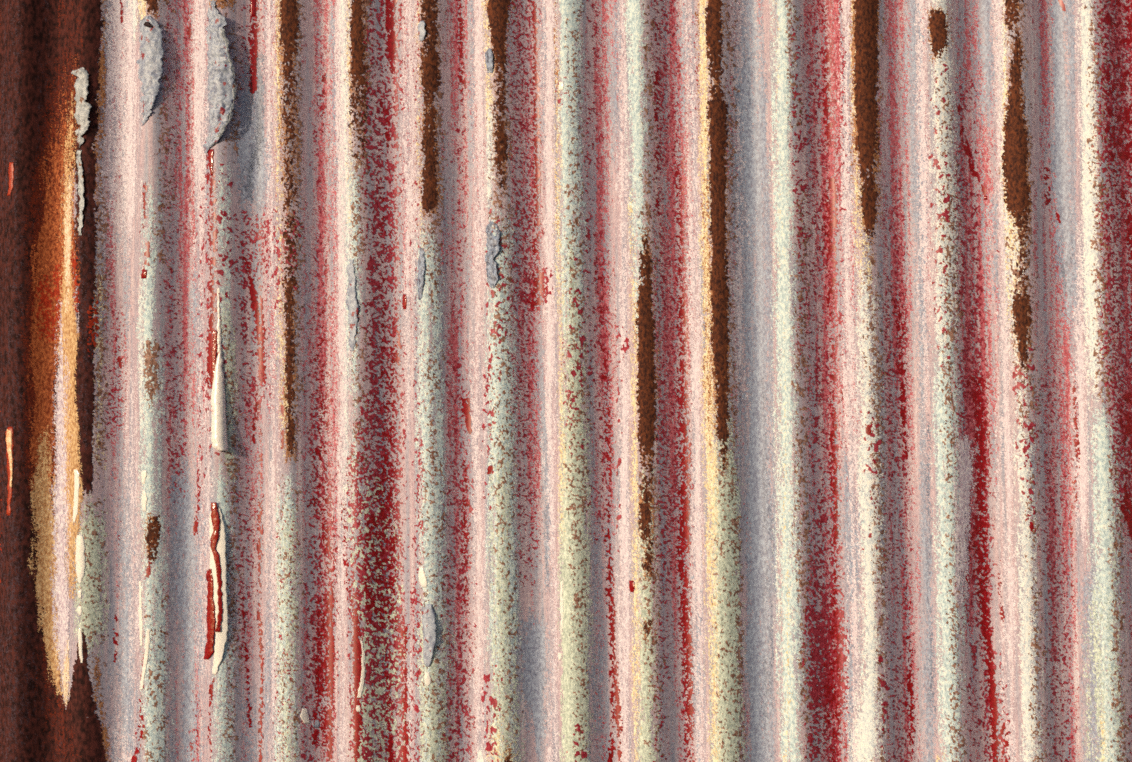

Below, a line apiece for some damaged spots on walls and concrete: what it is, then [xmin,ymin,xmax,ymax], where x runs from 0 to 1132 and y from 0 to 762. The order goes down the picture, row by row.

corrosion [0,0,113,762]
peeling [136,0,630,762]
corrosion [412,0,456,762]
corrosion [480,0,524,762]
corrosion [627,4,669,762]
corrosion [694,0,748,762]
corrosion [848,0,890,762]
corrosion [926,3,968,762]
corrosion [998,0,1042,440]